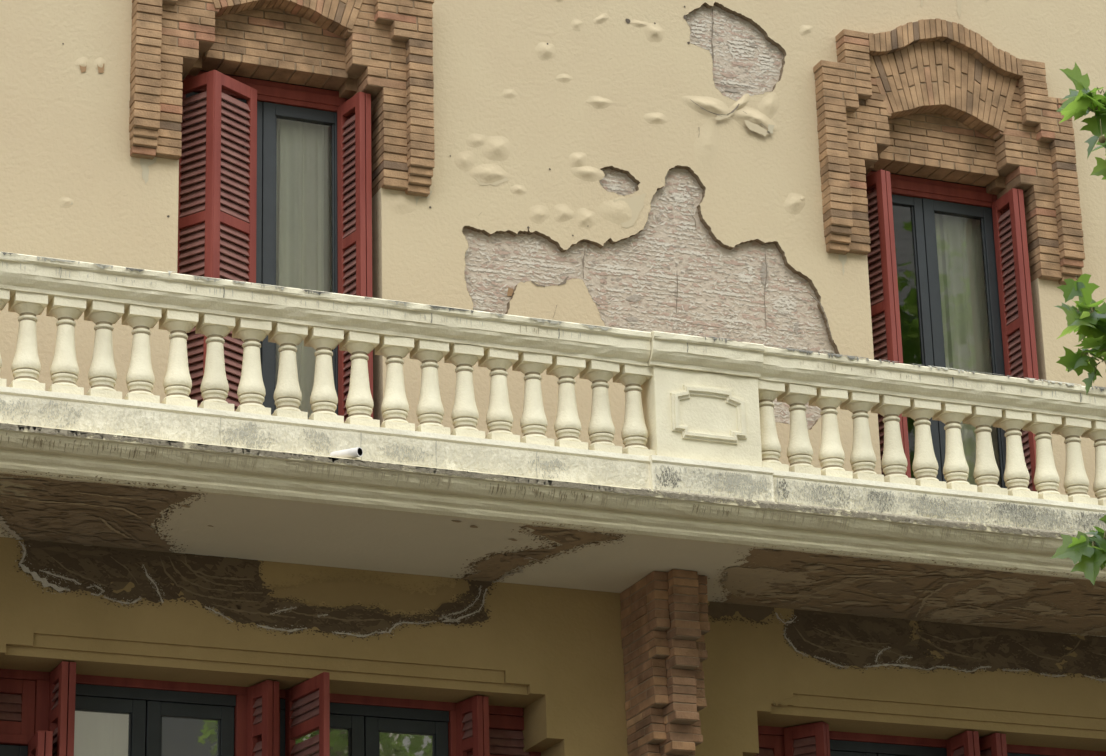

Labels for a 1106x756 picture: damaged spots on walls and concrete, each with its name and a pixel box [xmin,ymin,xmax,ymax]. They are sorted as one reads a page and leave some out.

spalling [685,2,786,101]
spalling [462,165,839,355]
spalling [805,403,822,430]